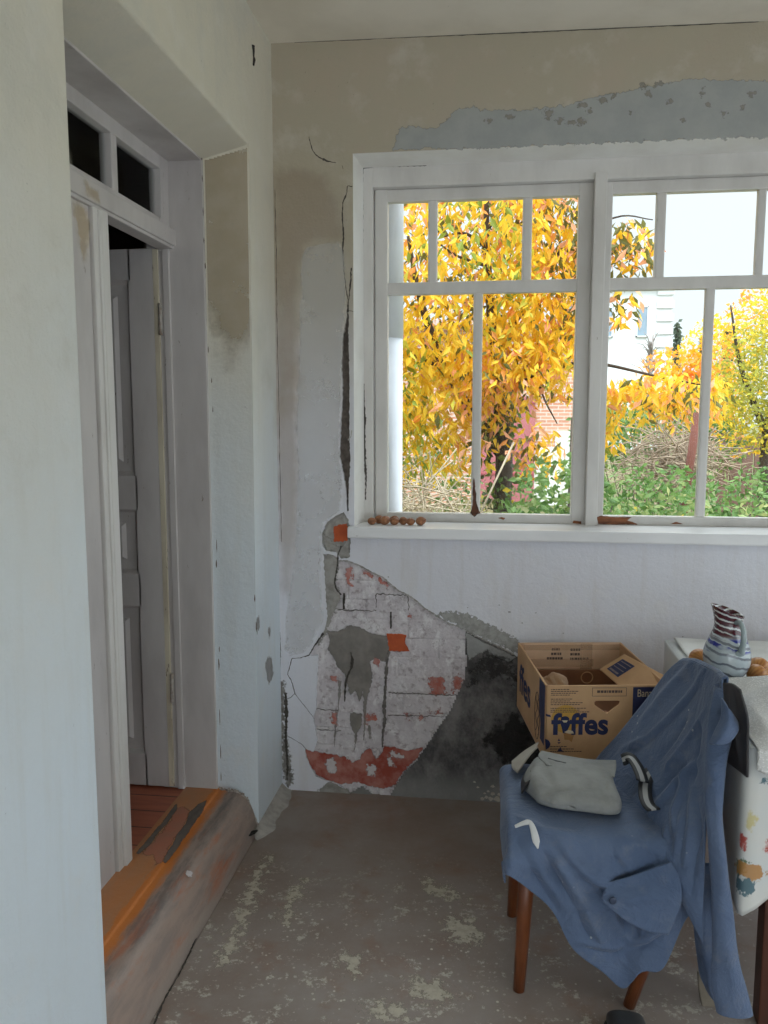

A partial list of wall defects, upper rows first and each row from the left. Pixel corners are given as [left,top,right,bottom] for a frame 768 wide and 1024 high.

peeling [392,78,768,151]
crack [309,139,353,511]
crack [287,632,324,717]
flaking render [305,512,514,795]
damp [466,650,517,688]
damp [483,712,540,764]
peeling [163,801,206,863]